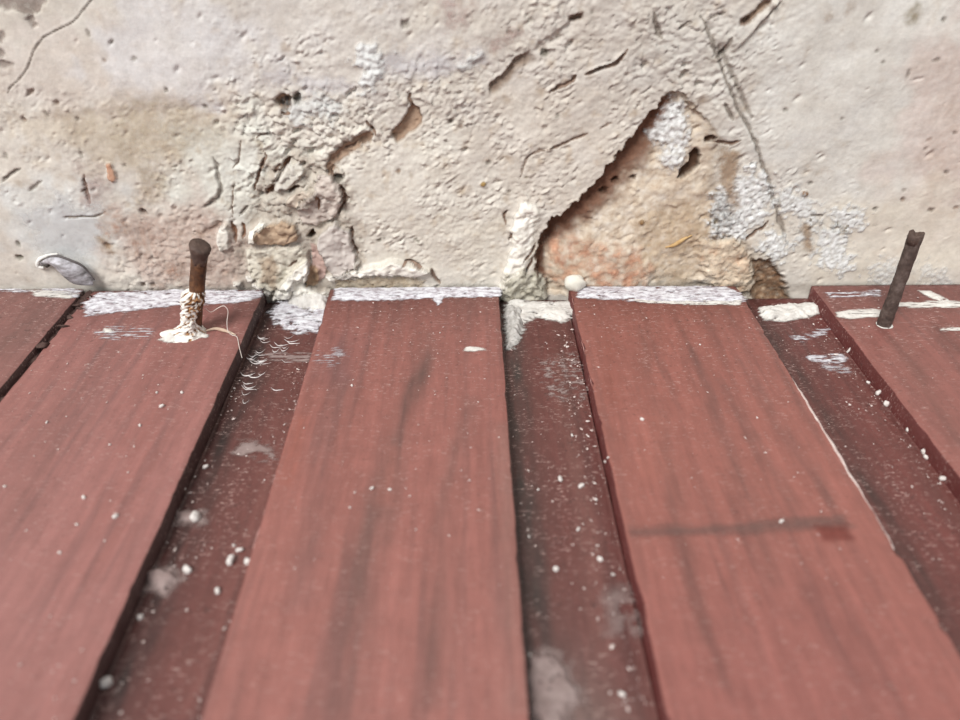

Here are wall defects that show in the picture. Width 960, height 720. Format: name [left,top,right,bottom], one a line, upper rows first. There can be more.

crack [7,0,92,93]
crack [729,1,782,58]
spalling [392,93,422,141]
peeling [216,150,357,301]
flaking render [534,91,789,299]
leakage [706,162,869,279]